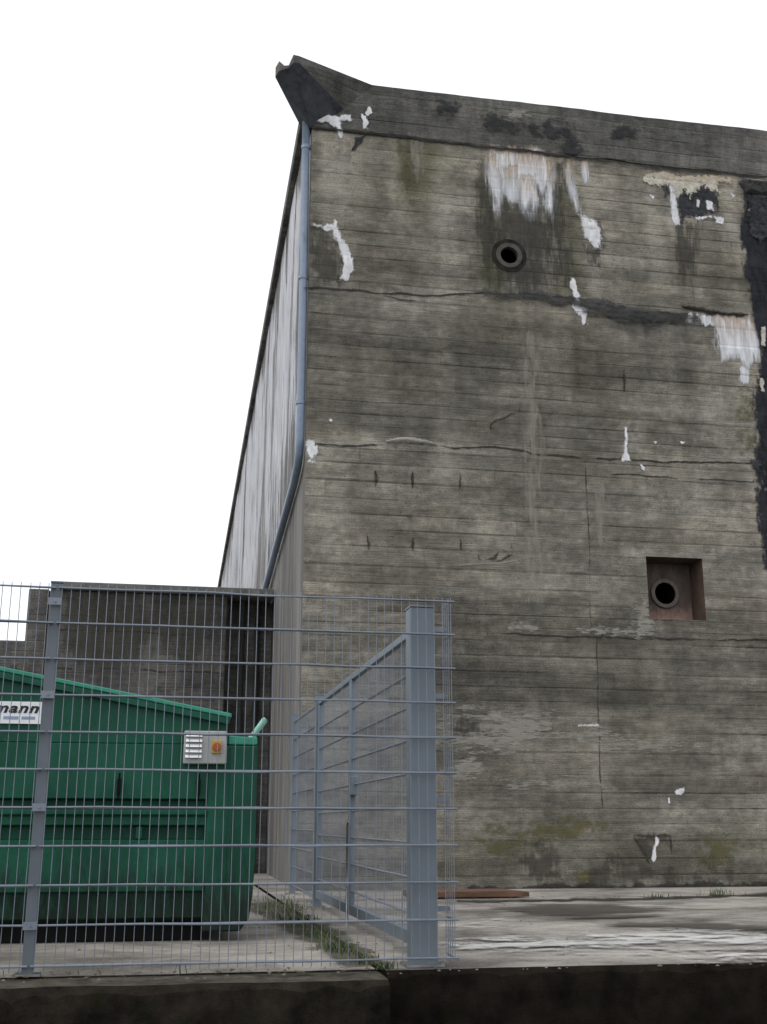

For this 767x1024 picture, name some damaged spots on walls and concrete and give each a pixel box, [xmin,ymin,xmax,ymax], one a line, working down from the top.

crack [304,286,502,301]
leakage [476,144,605,325]
crack [659,305,749,317]
spalling [643,170,767,243]
leakage [686,182,767,569]
crack [315,408,753,560]
crack [503,604,767,806]
spalling [633,834,672,864]